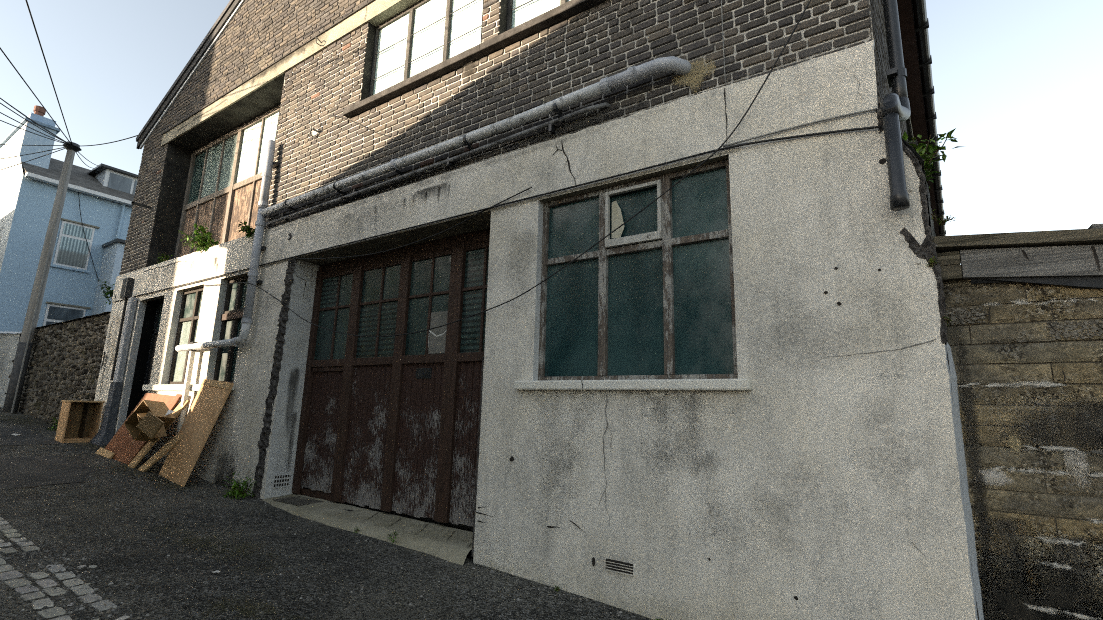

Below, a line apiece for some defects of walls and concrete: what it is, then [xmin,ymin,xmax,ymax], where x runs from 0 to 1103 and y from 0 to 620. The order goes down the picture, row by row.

crack [555,140,576,185]
spalling [899,140,987,343]
spalling [472,357,484,556]
crack [581,380,612,515]
damp [958,350,1103,620]